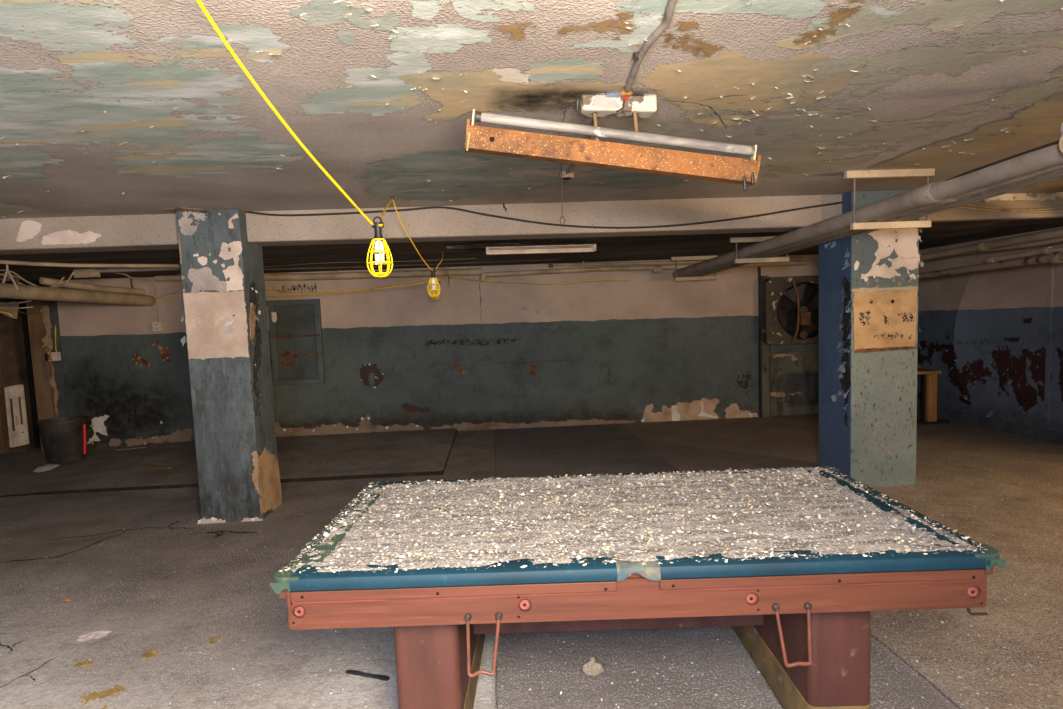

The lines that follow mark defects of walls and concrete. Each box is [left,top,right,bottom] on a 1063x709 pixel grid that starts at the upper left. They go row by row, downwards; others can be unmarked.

peeling [0,0,326,193]
peeling [290,0,1063,177]
peeling [16,220,101,245]
flaking render [133,207,262,416]
peeling [359,363,384,388]
flaking render [825,228,1063,426]
spalling [241,447,283,522]
spalling [280,466,987,576]